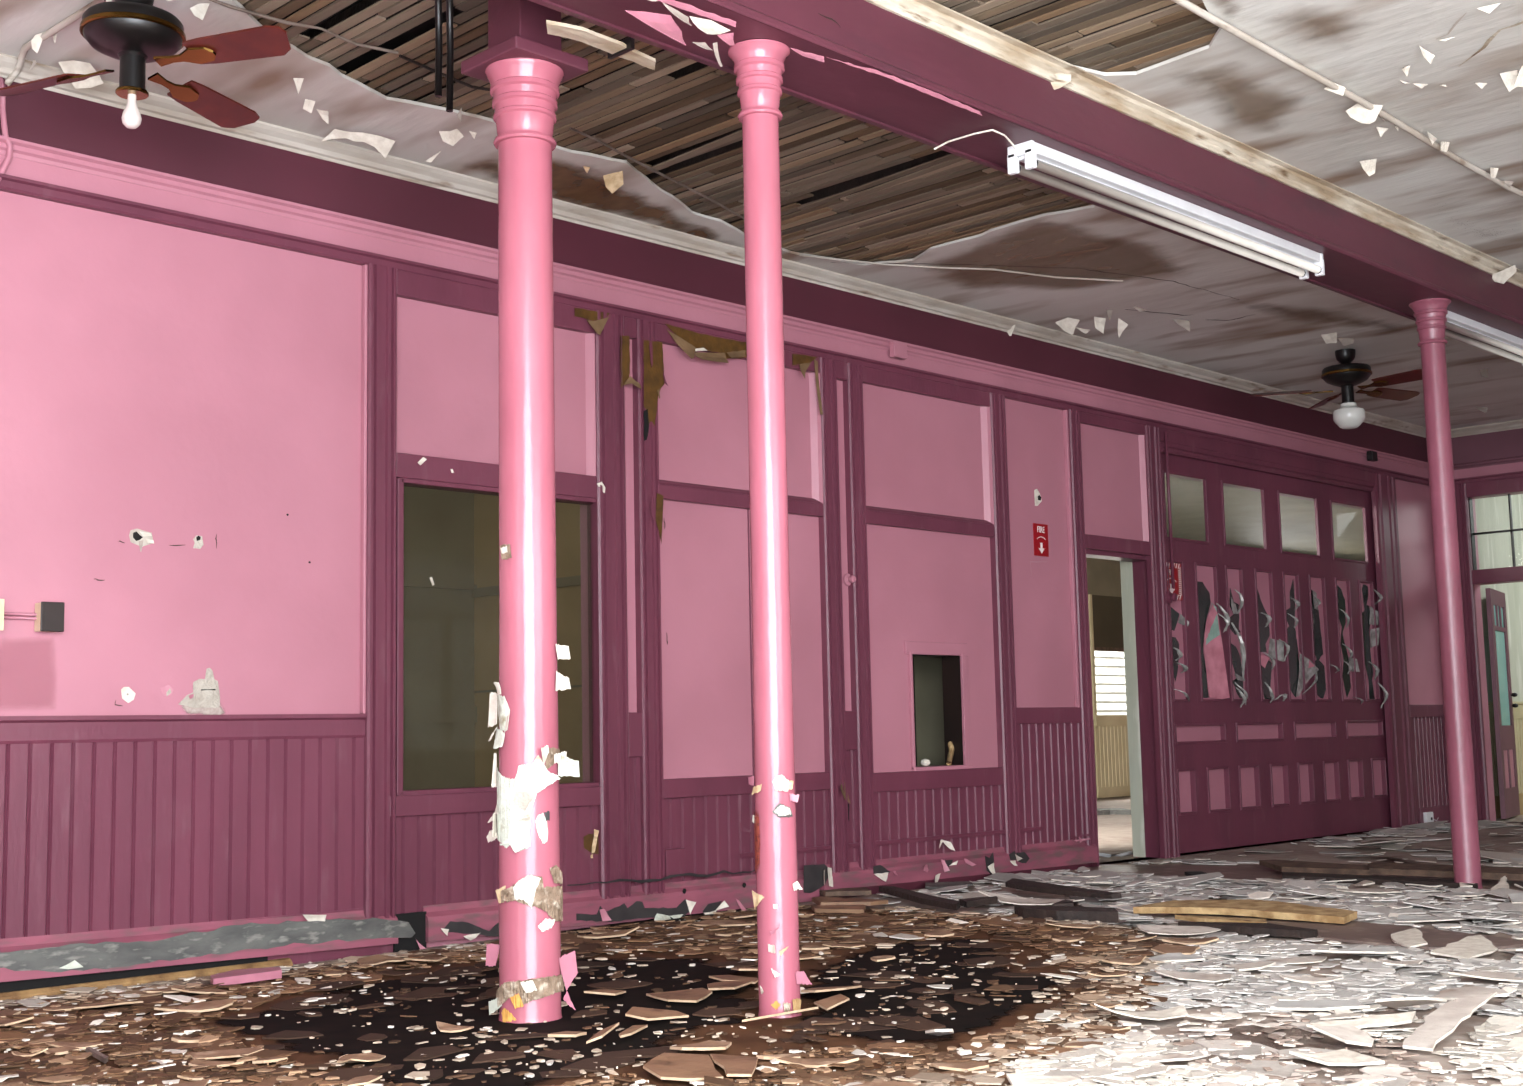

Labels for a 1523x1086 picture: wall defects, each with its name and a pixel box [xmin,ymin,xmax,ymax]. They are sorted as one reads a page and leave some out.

peeling [625,0,736,67]
crack [1437,13,1523,67]
peeling [293,78,395,158]
peeling [791,48,982,116]
peeling [1324,83,1399,137]
peeling [620,324,747,441]
peeling [556,644,571,691]
peeling [486,682,580,853]
peeling [748,775,799,818]
peeling [0,915,426,972]
peeling [441,921,499,941]
damp [0,907,1164,1086]